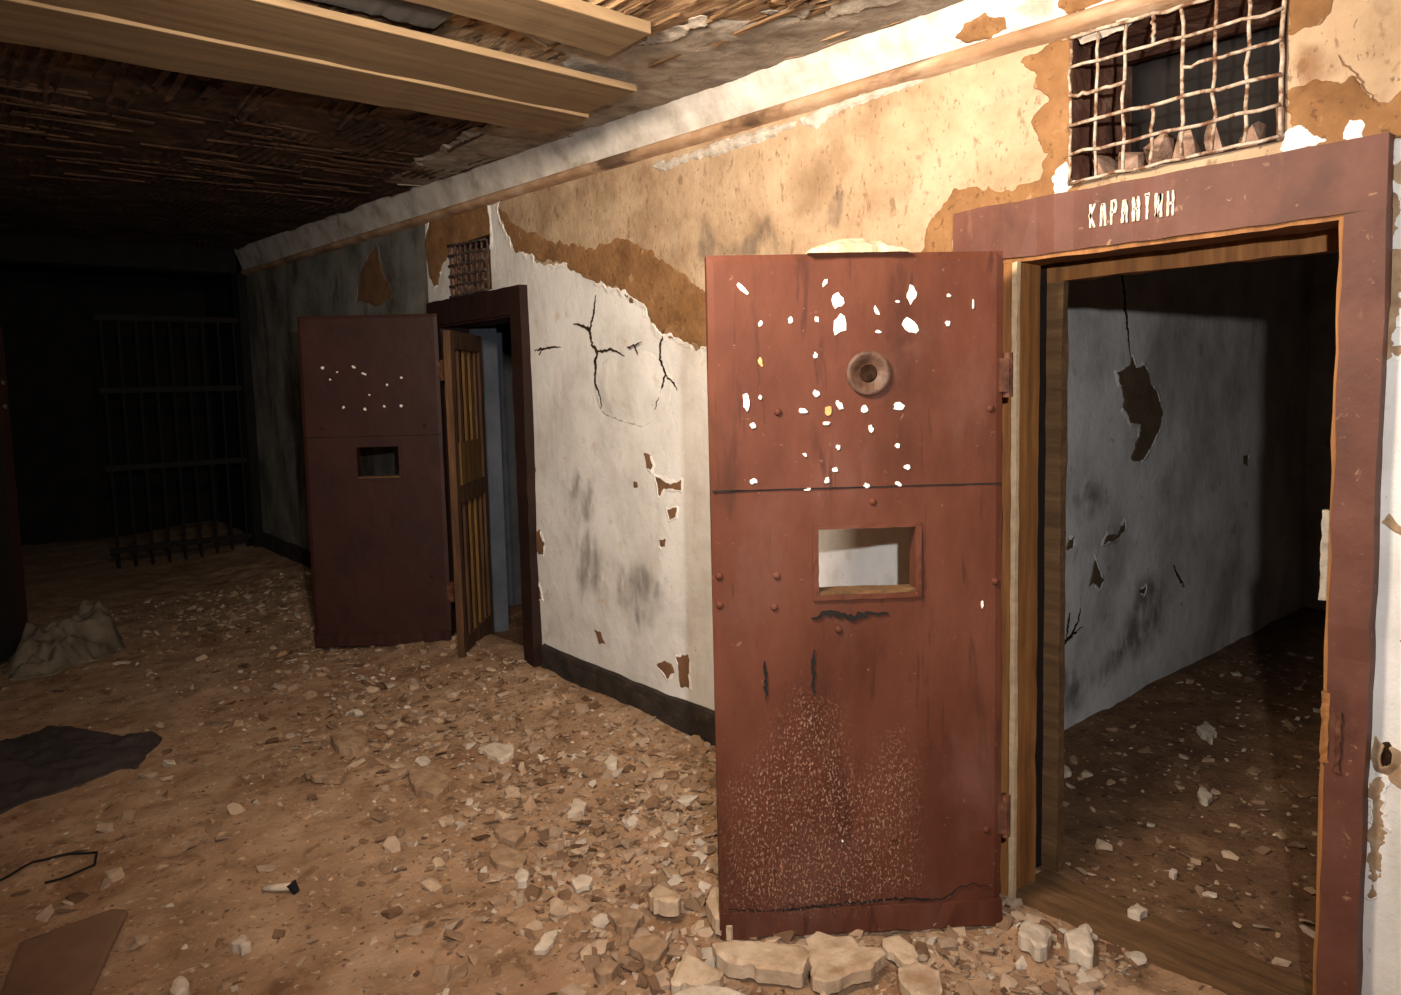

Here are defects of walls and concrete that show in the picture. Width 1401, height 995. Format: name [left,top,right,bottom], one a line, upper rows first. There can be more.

flaking render [382,0,1401,366]
crack [534,295,677,410]
flaking render [1115,354,1163,462]
flaking render [633,453,684,549]
flaking render [1382,514,1401,535]
flaking render [657,653,692,692]
flaking render [1365,736,1401,901]